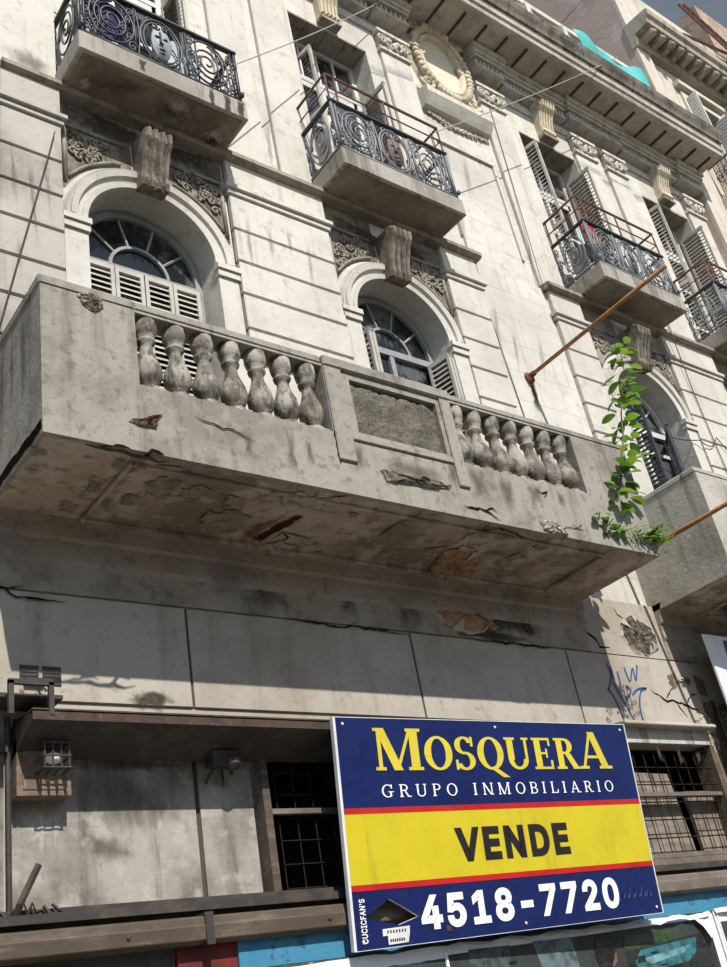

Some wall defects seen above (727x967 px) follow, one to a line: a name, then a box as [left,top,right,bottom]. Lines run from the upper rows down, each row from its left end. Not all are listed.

spalling [129,414,163,429]
crack [85,444,170,463]
spalling [381,468,452,489]
rust [244,516,302,542]
crack [0,586,59,602]
spalling [430,595,498,635]
spalling [618,612,659,657]
crack [651,684,704,717]